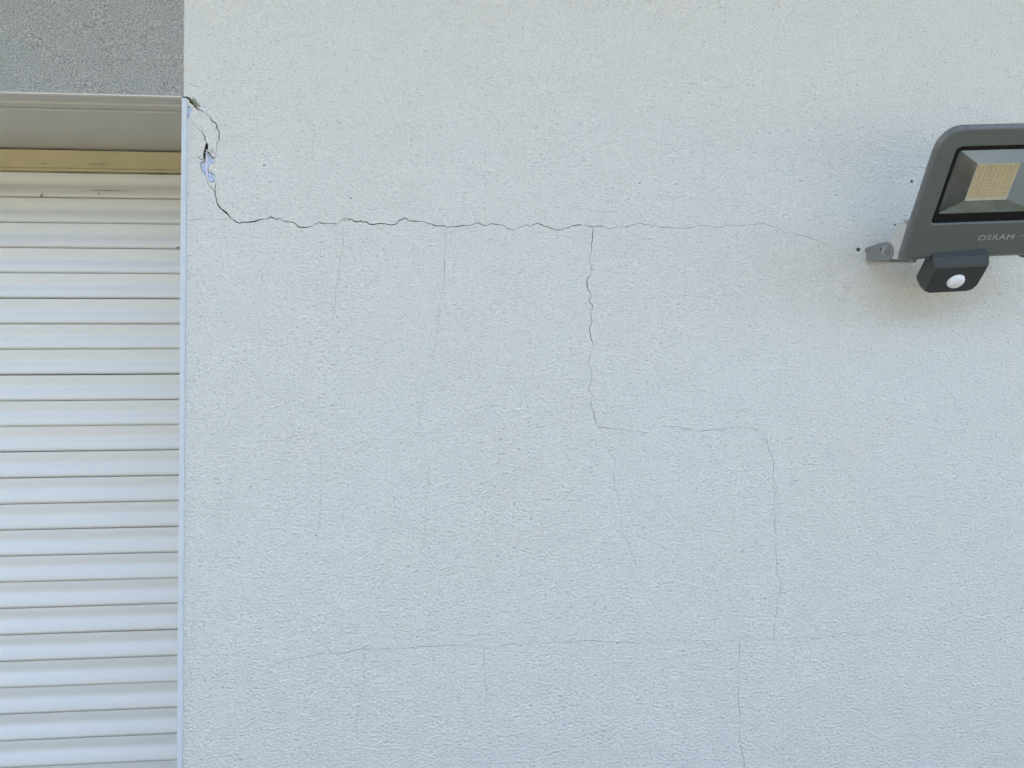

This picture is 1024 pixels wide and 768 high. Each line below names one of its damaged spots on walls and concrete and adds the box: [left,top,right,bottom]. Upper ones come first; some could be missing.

crack [187,97,830,564]